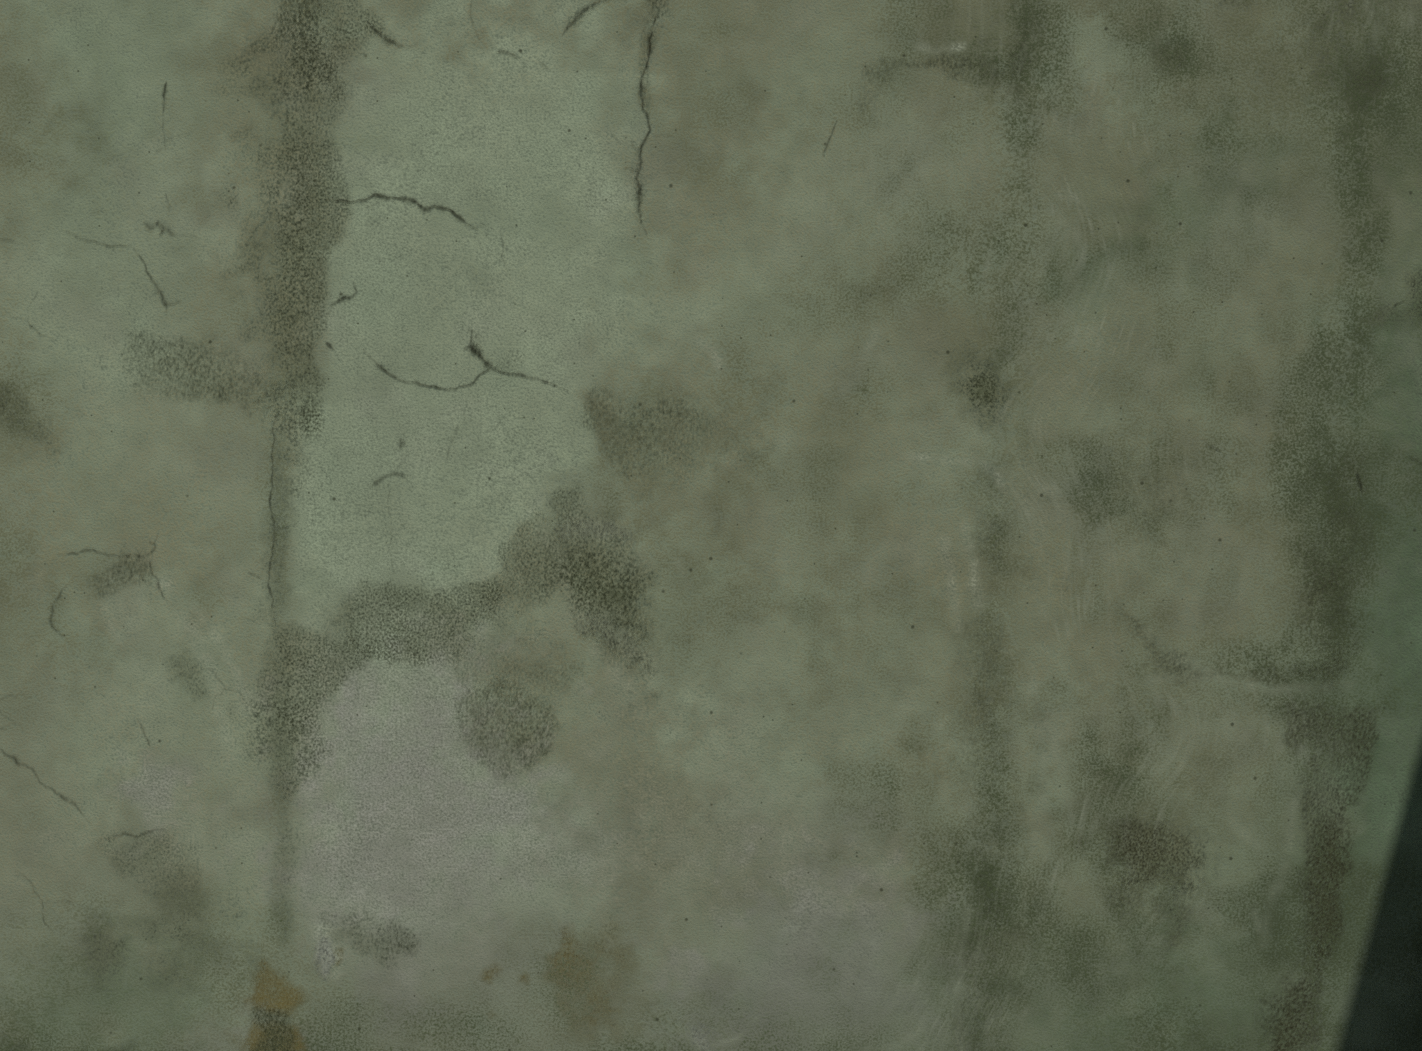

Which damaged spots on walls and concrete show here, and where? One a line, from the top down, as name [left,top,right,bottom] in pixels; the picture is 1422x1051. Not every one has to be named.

crack [336,194,464,221]
leakage [265,117,343,431]
crack [381,346,548,389]
leakage [525,520,652,645]
leakage [266,583,499,747]